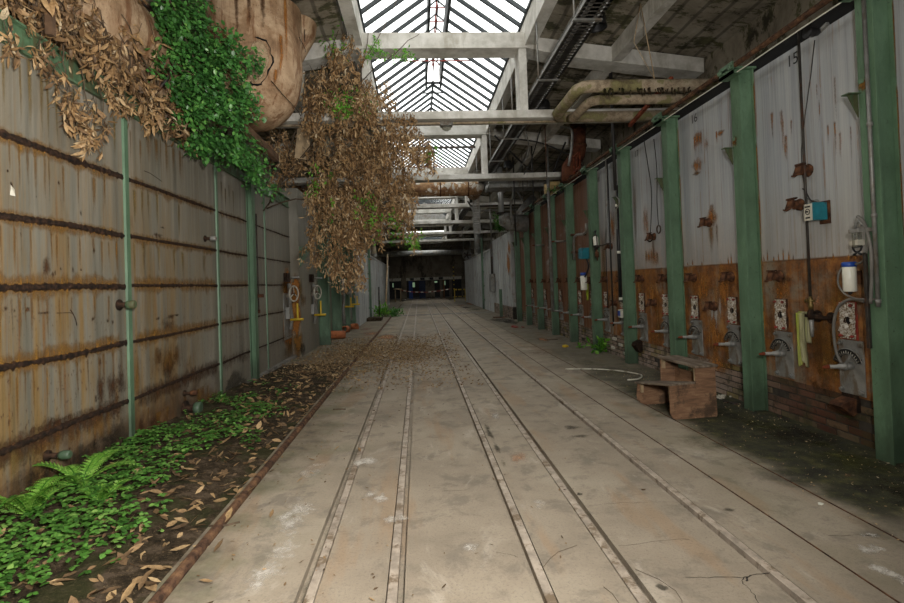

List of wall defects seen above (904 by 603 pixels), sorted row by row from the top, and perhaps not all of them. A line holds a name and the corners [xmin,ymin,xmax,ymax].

corrosion [0,129,289,237]
corrosion [0,211,306,467]